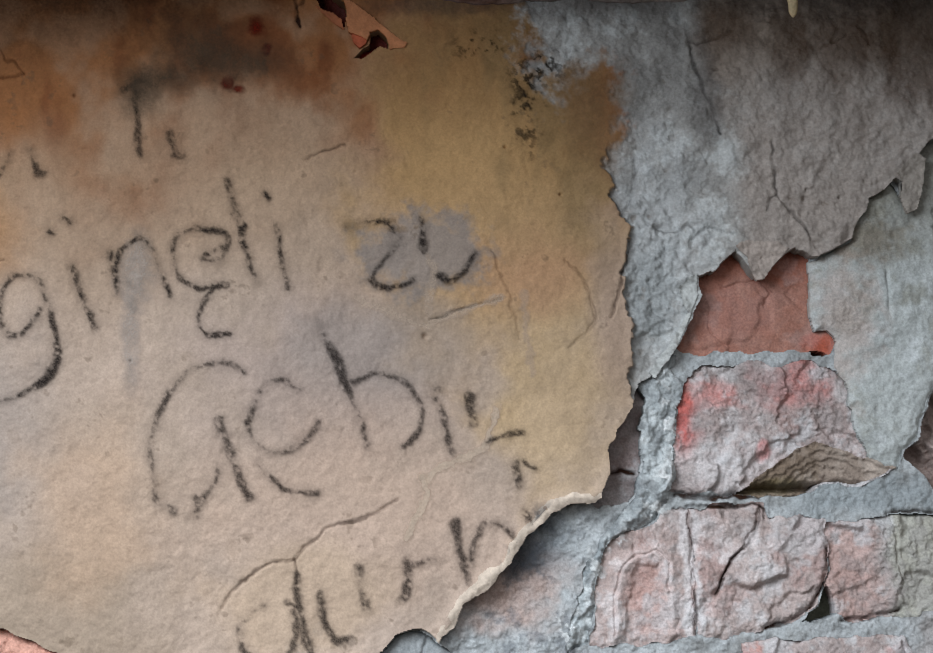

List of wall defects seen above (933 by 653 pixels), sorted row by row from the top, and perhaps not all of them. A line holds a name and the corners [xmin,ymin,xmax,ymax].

flaking render [316,0,407,59]
flaking render [380,0,933,653]
flaking render [0,628,57,653]